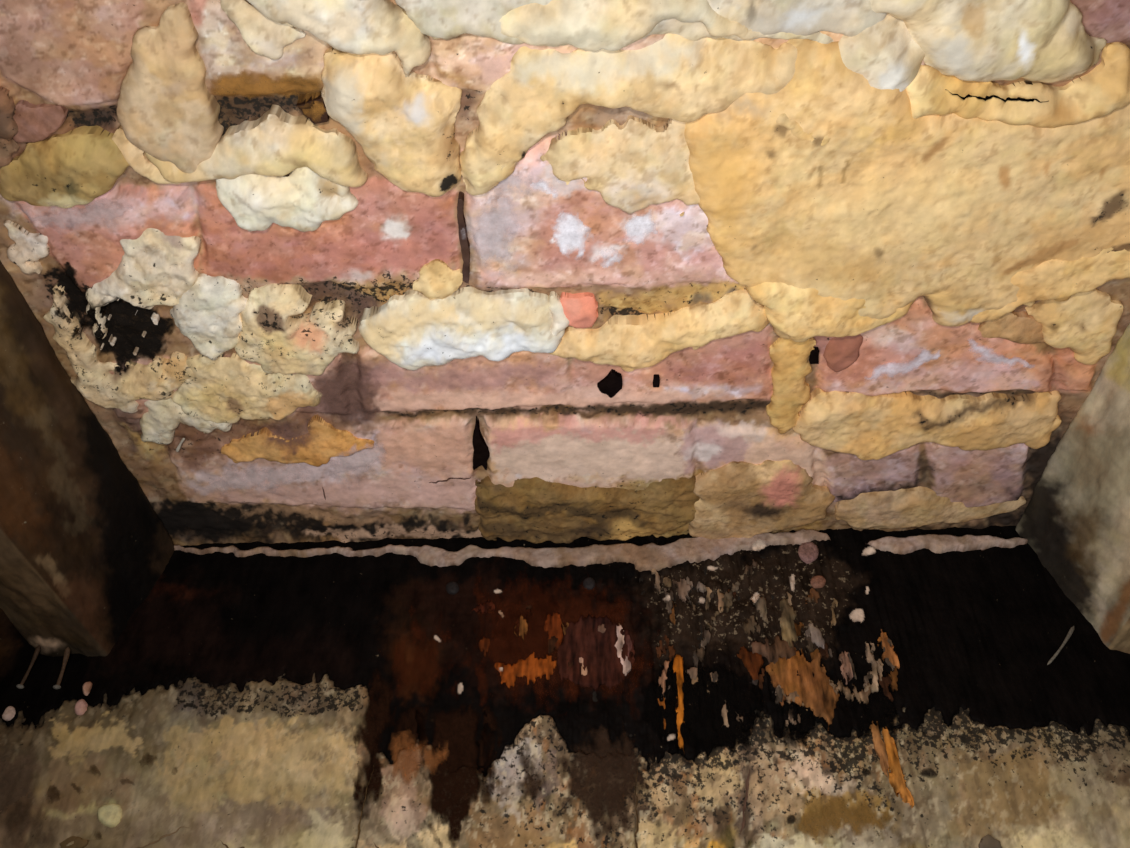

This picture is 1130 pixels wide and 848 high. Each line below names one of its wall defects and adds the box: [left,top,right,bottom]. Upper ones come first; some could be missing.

crack [945,89,1048,103]
damp [44,262,174,373]
damp [488,583,625,696]
crack [355,765,379,848]
damp [353,651,501,846]
damp [520,753,543,798]
damp [562,728,647,838]
crack [632,762,640,848]
damp [642,661,810,754]
damp [787,798,886,839]
damp [849,684,897,736]
peeling [978,835,1002,848]